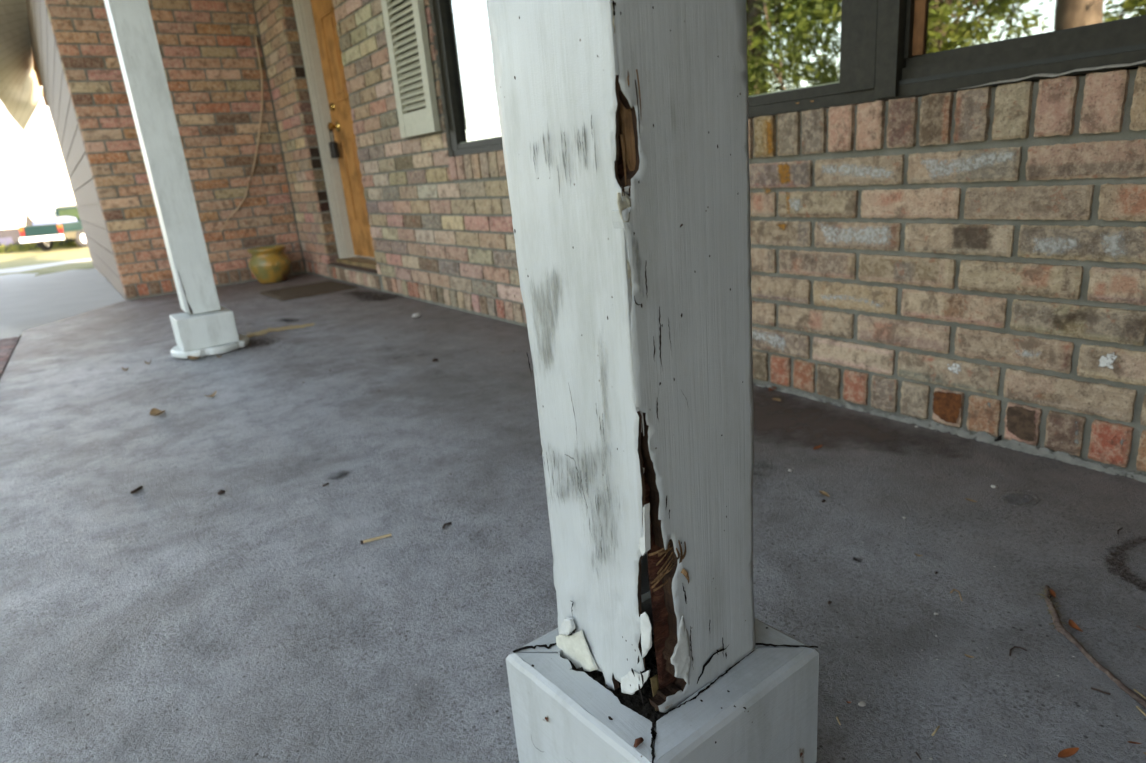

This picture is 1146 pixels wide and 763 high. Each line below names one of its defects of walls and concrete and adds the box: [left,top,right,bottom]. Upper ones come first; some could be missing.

peeling [617,192,631,222]
peeling [639,503,650,556]
crack [513,643,556,653]
peeling [556,601,598,672]
peeling [621,612,652,703]
peeling [671,616,691,685]
crack [650,586,818,760]